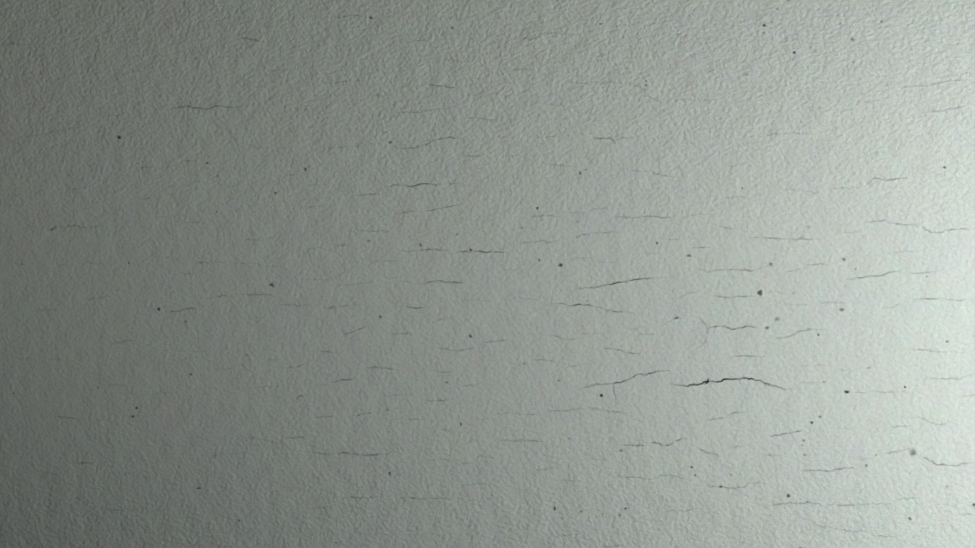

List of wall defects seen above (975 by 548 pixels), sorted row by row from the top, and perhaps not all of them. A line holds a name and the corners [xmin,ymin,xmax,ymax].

crack [572,348,792,392]